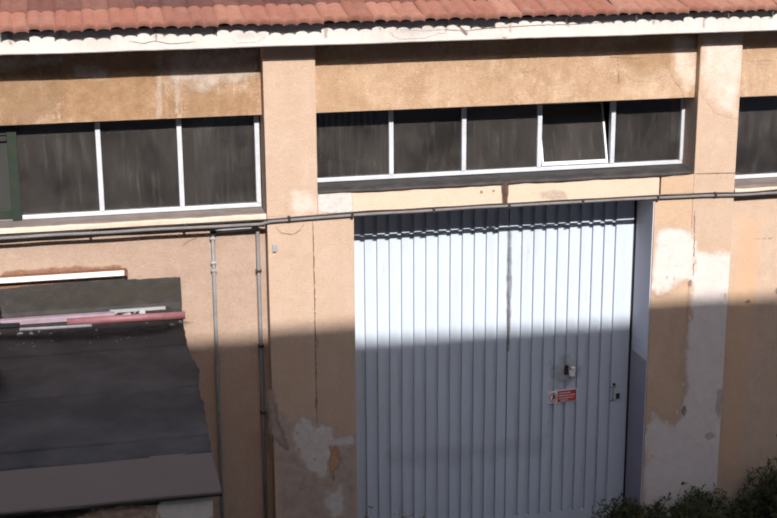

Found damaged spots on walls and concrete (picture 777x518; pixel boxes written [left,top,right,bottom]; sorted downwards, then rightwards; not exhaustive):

crack [276,226,318,410]
peeling [642,224,730,517]
peeling [1,497,213,518]
flaking render [291,415,356,518]